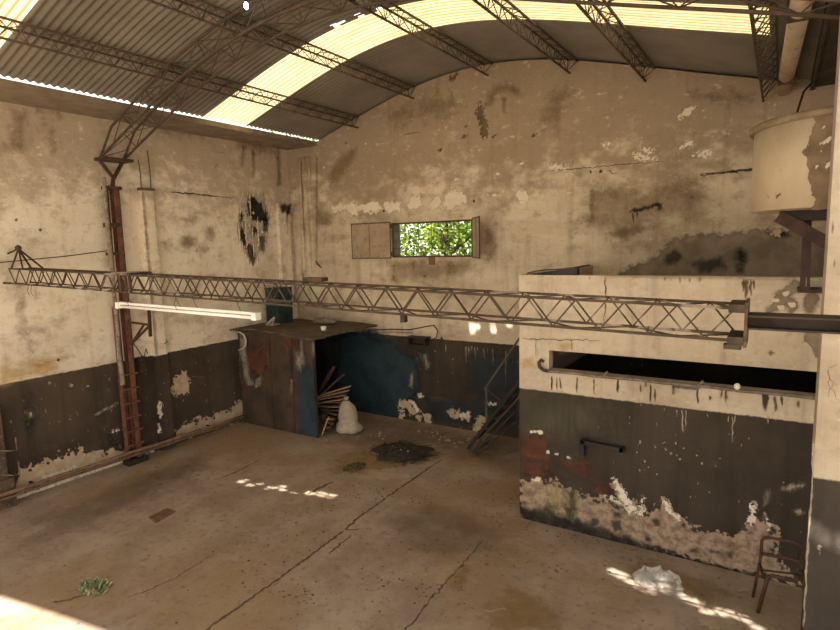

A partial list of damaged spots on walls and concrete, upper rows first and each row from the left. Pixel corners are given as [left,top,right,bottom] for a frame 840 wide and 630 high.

crack [545,161,661,174]
crack [701,168,752,176]
peeling [802,114,833,211]
peeling [237,192,269,265]
water stain [615,203,662,236]
peeling [618,227,825,313]
peeling [397,393,432,423]
peeling [447,406,485,432]
peeling [16,428,125,499]
crack [206,463,436,630]
peeling [520,443,815,626]
crack [404,546,478,629]